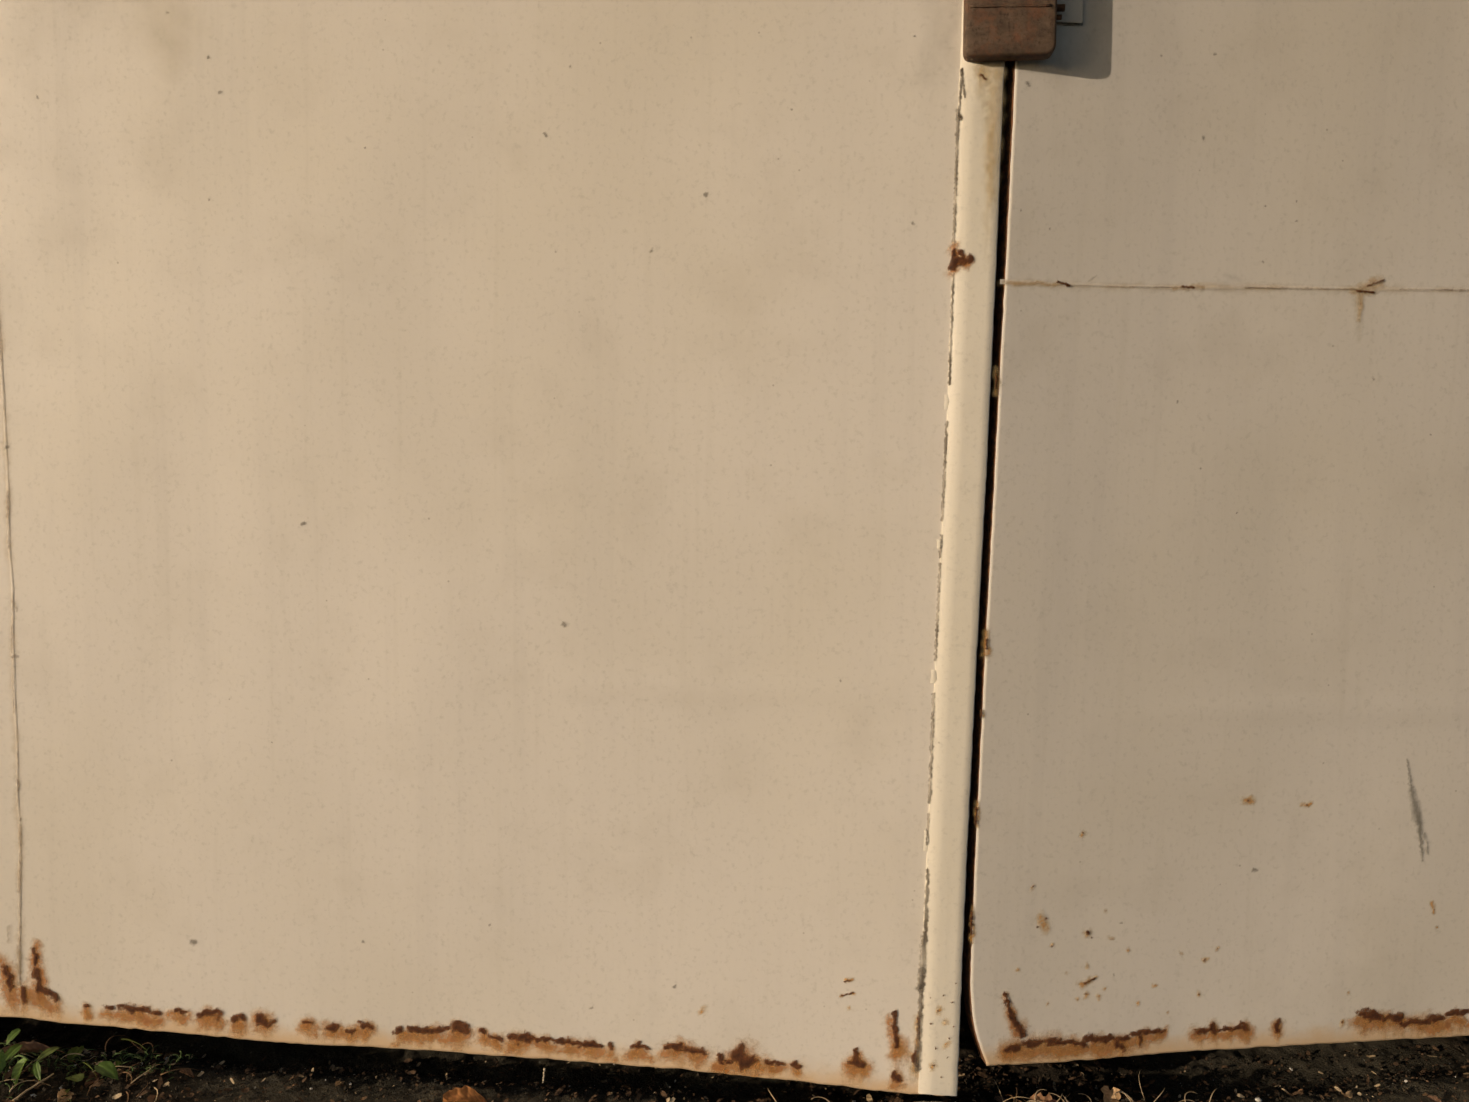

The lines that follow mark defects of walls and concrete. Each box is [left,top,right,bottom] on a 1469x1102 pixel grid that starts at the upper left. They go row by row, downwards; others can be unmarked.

corrosion [948,243,974,275]
corrosion [0,941,58,1014]
corrosion [83,1004,276,1035]
corrosion [297,1020,802,1076]
corrosion [844,1047,871,1077]
corrosion [886,983,957,1090]
corrosion [999,992,1168,1061]
corrosion [1190,1020,1253,1041]
corrosion [1272,1018,1281,1038]
corrosion [1341,1007,1469,1035]